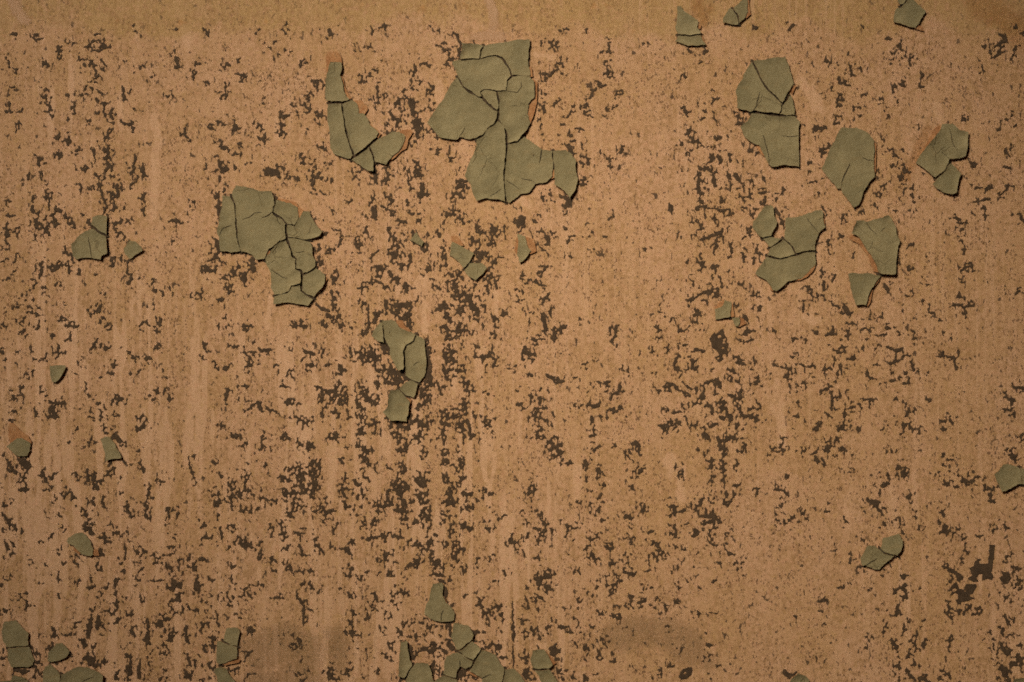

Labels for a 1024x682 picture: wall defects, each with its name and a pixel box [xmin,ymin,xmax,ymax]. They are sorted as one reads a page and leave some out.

peeling [0,27,264,682]
peeling [186,22,1024,682]
peeling [675,6,708,64]